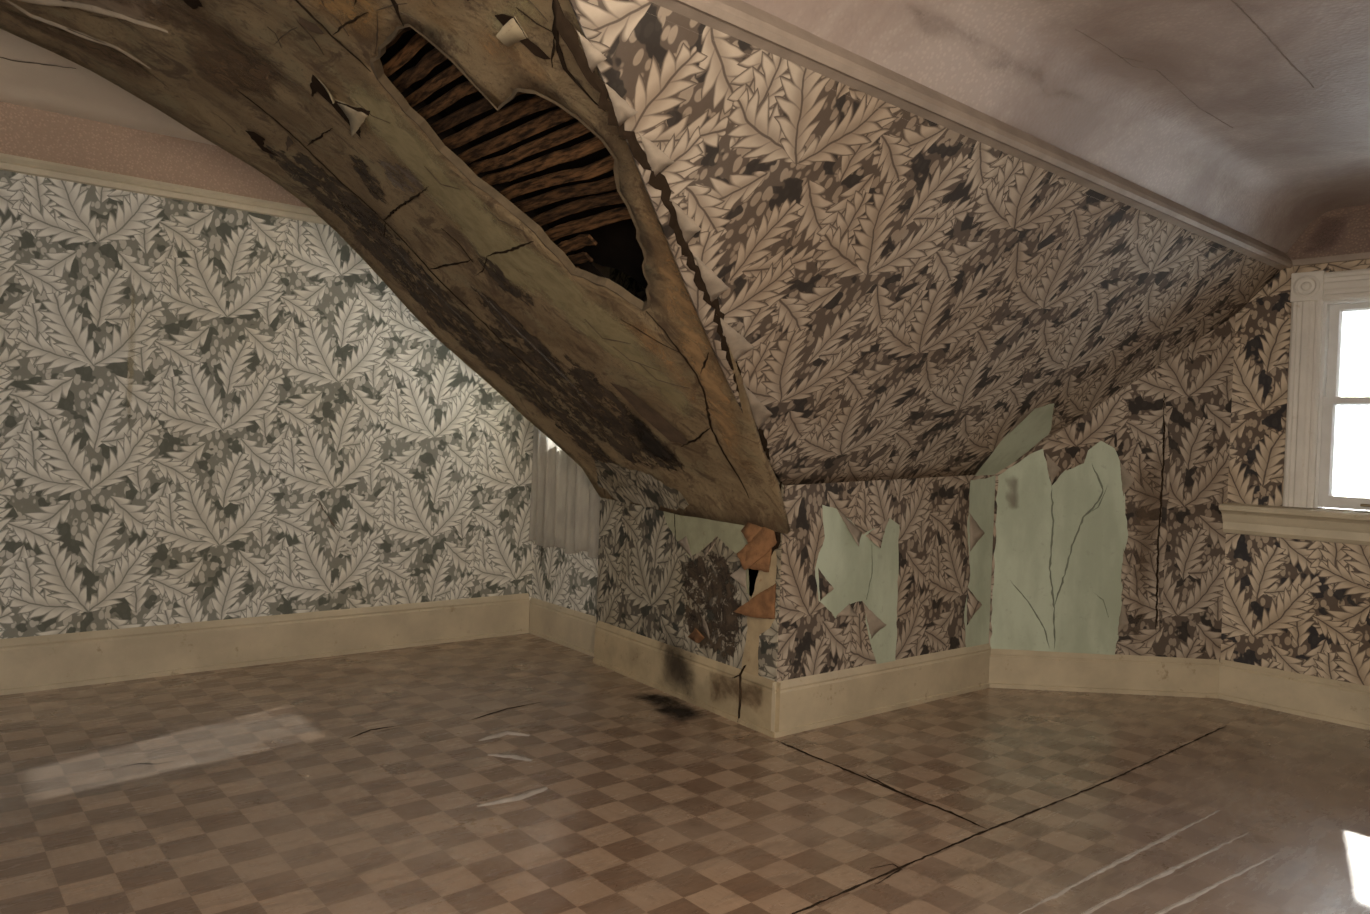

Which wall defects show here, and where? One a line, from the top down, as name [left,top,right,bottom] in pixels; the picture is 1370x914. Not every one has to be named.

crack [222,0,436,123]
flaking render [495,14,550,59]
crack [516,0,606,112]
flaking render [370,24,651,311]
crack [235,89,546,385]
crack [585,311,749,498]
peeling [1101,432,1135,496]
leakage [641,695,697,720]
leakage [666,646,692,684]
leakage [681,553,761,704]
flaking render [730,522,781,591]
peeling [818,568,834,601]